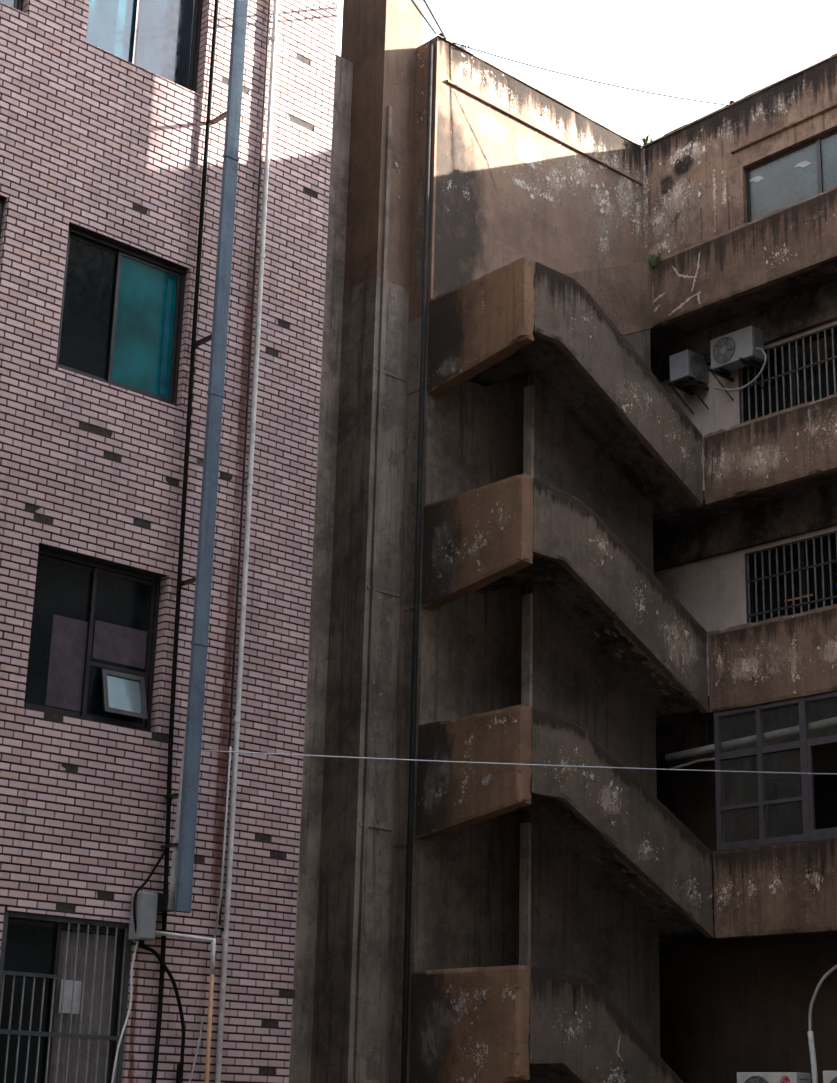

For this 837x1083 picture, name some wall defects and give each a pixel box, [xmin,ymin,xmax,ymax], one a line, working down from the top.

damp [439,37,837,194]
crack [653,252,701,315]
damp [536,262,837,457]
damp [655,190,836,284]
damp [534,477,809,657]
damp [531,967,684,1083]